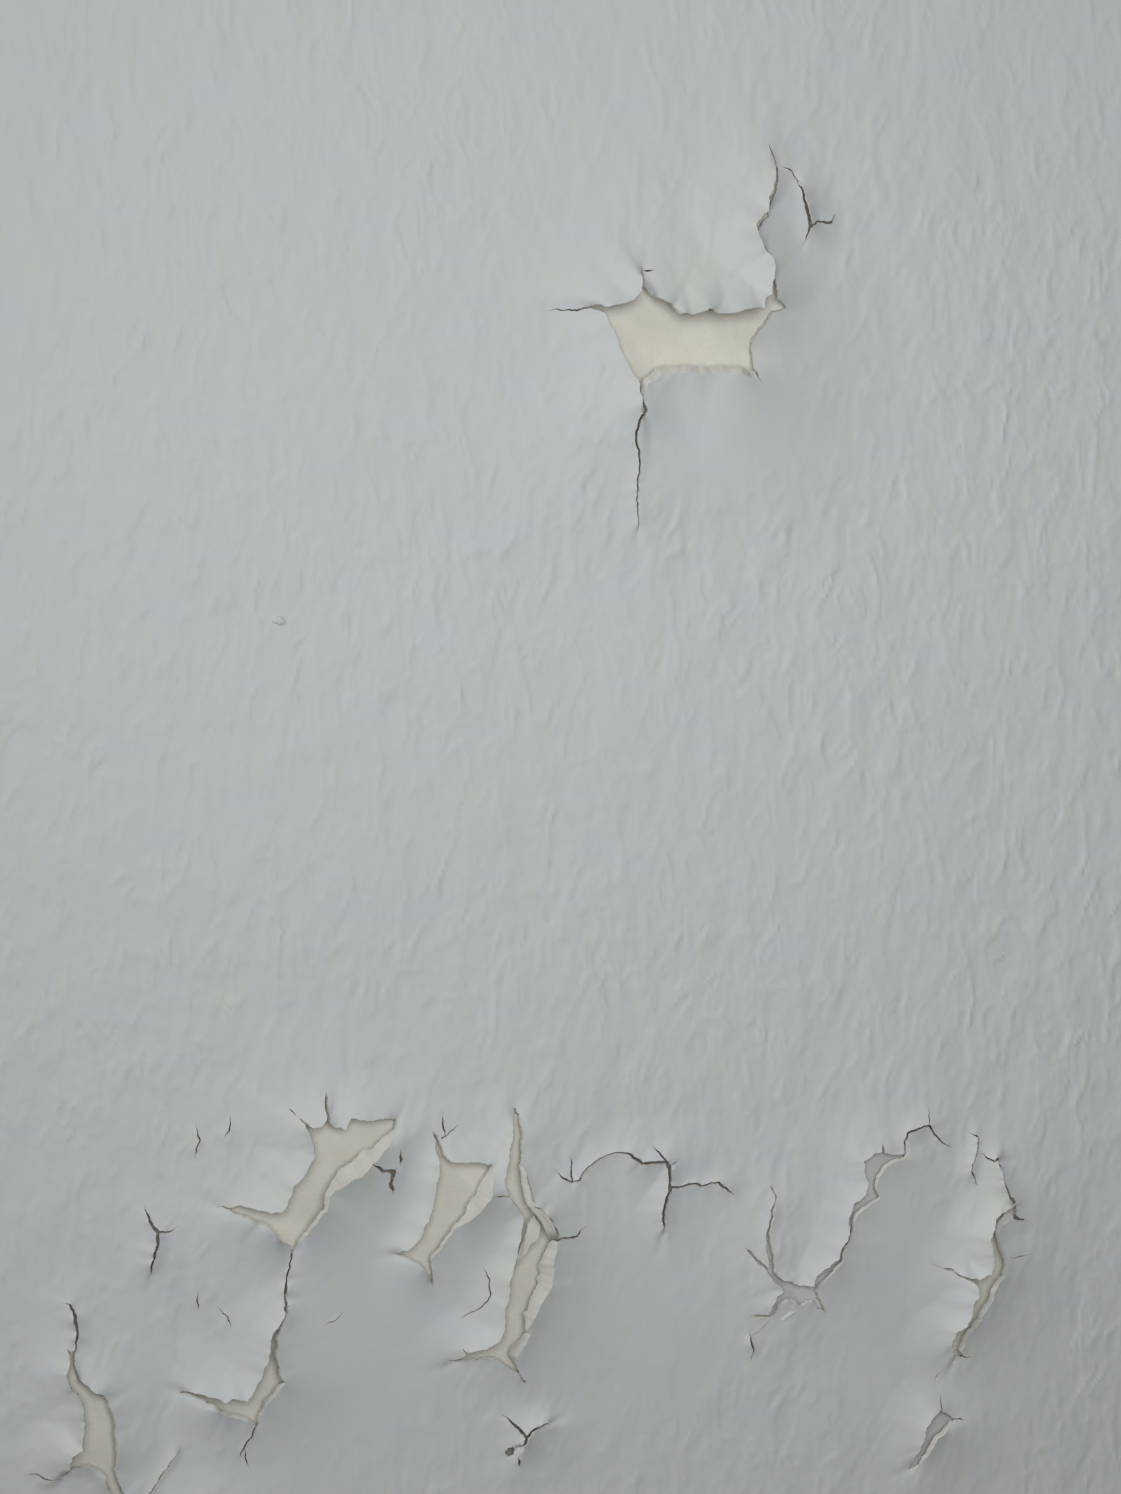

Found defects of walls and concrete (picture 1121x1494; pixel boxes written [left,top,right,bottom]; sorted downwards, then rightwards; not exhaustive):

peeling [425,22,933,606]
crack [464,1402,607,1494]
peeling [0,973,1103,1494]
crack [555,1102,748,1289]